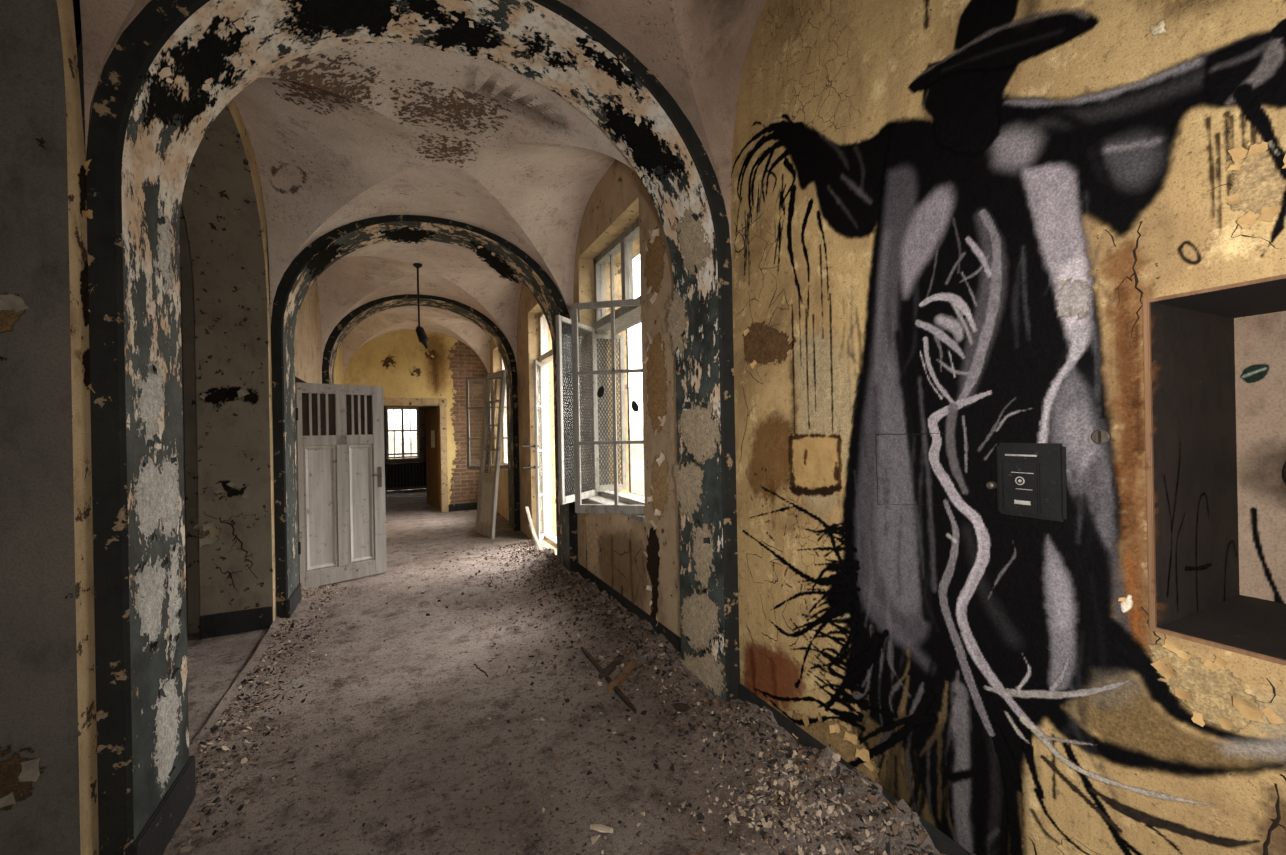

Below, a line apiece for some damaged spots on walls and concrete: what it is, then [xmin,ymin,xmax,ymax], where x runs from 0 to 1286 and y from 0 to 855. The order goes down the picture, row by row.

peeling [138,0,511,168]
peeling [519,27,686,183]
peeling [80,262,94,327]
peeling [152,209,176,292]
peeling [374,226,437,245]
peeling [467,241,521,284]
flaking render [410,340,491,504]
peeling [643,207,726,698]
peeling [132,361,221,799]
peeling [1149,634,1285,732]
crack [1256,678,1276,703]
crack [1262,774,1286,855]